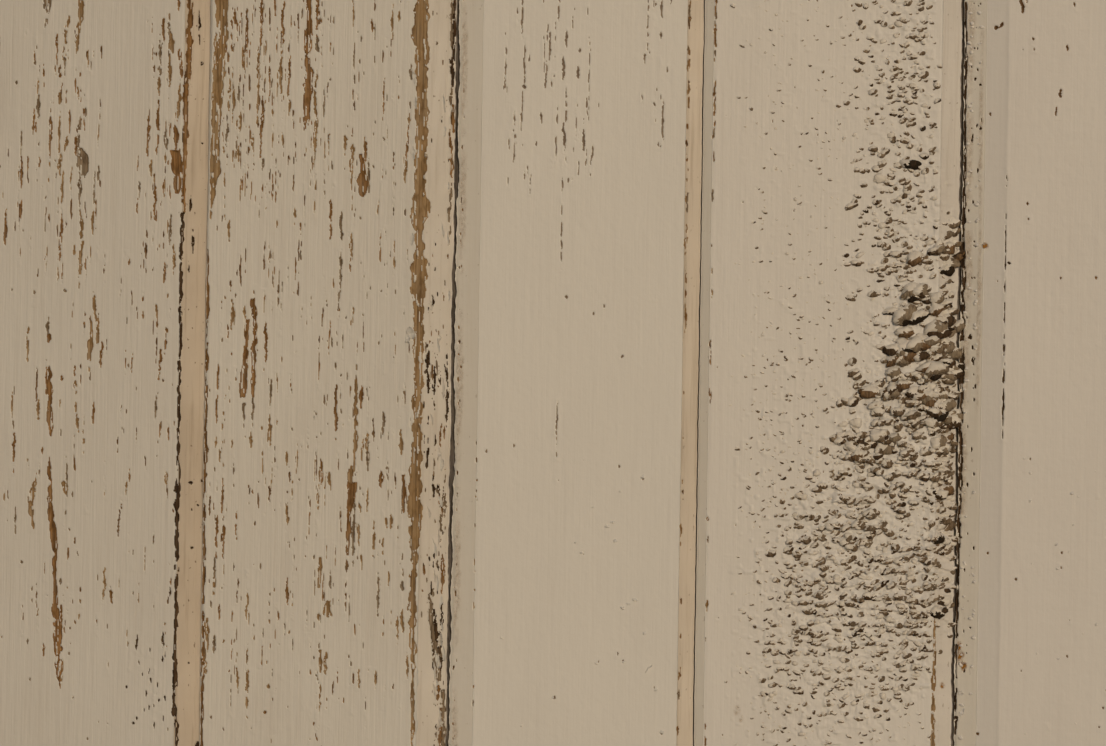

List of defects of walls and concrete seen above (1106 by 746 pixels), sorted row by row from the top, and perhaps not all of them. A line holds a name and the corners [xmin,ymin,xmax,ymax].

peeling [0,0,102,292]
peeling [128,0,194,298]
peeling [3,295,107,689]
peeling [97,567,113,604]
peeling [126,623,167,724]
peeling [121,279,175,466]
peeling [200,0,464,746]